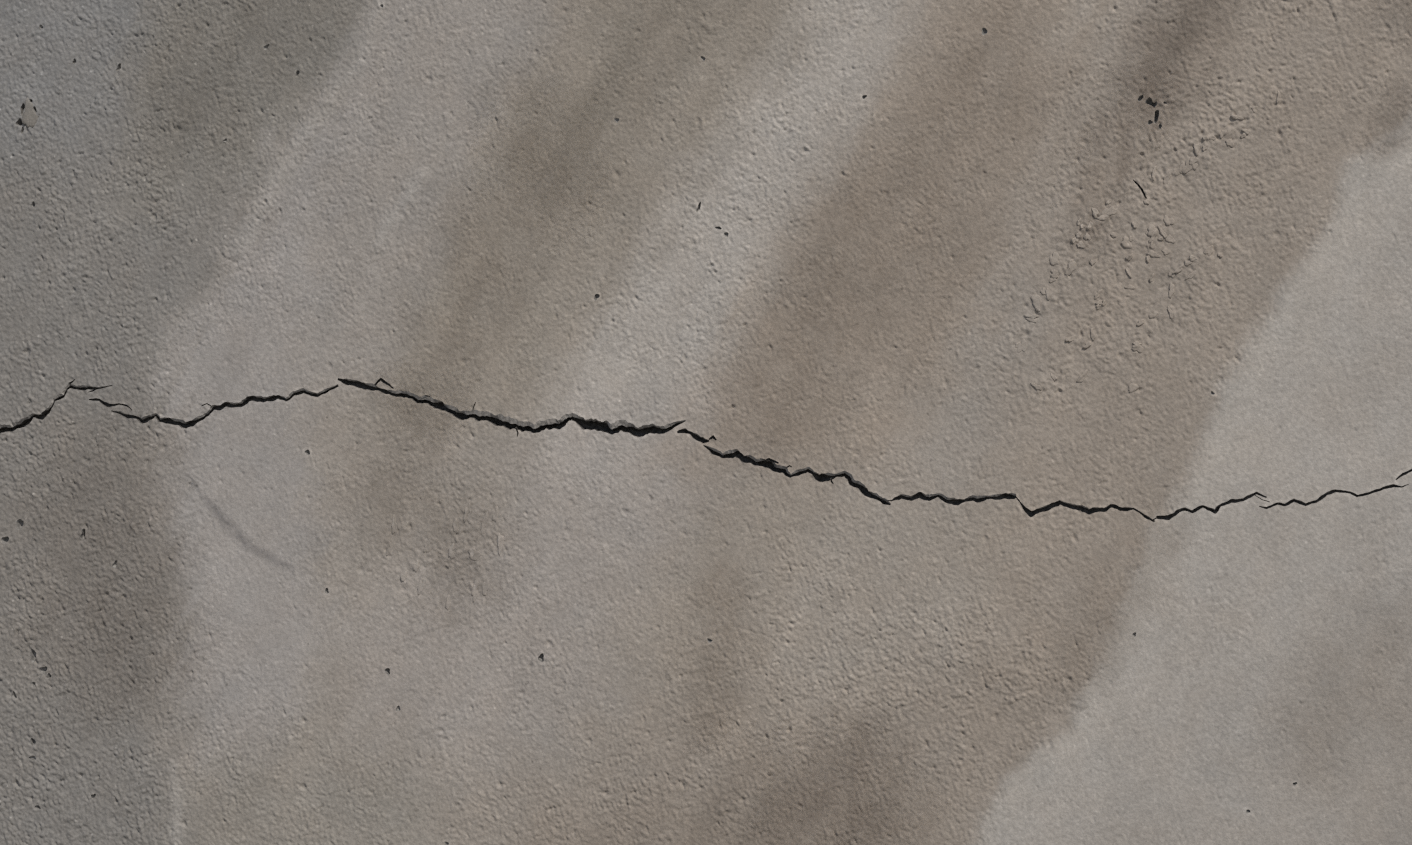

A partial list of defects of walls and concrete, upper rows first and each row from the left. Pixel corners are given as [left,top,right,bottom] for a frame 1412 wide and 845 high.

crack [0,378,1412,522]